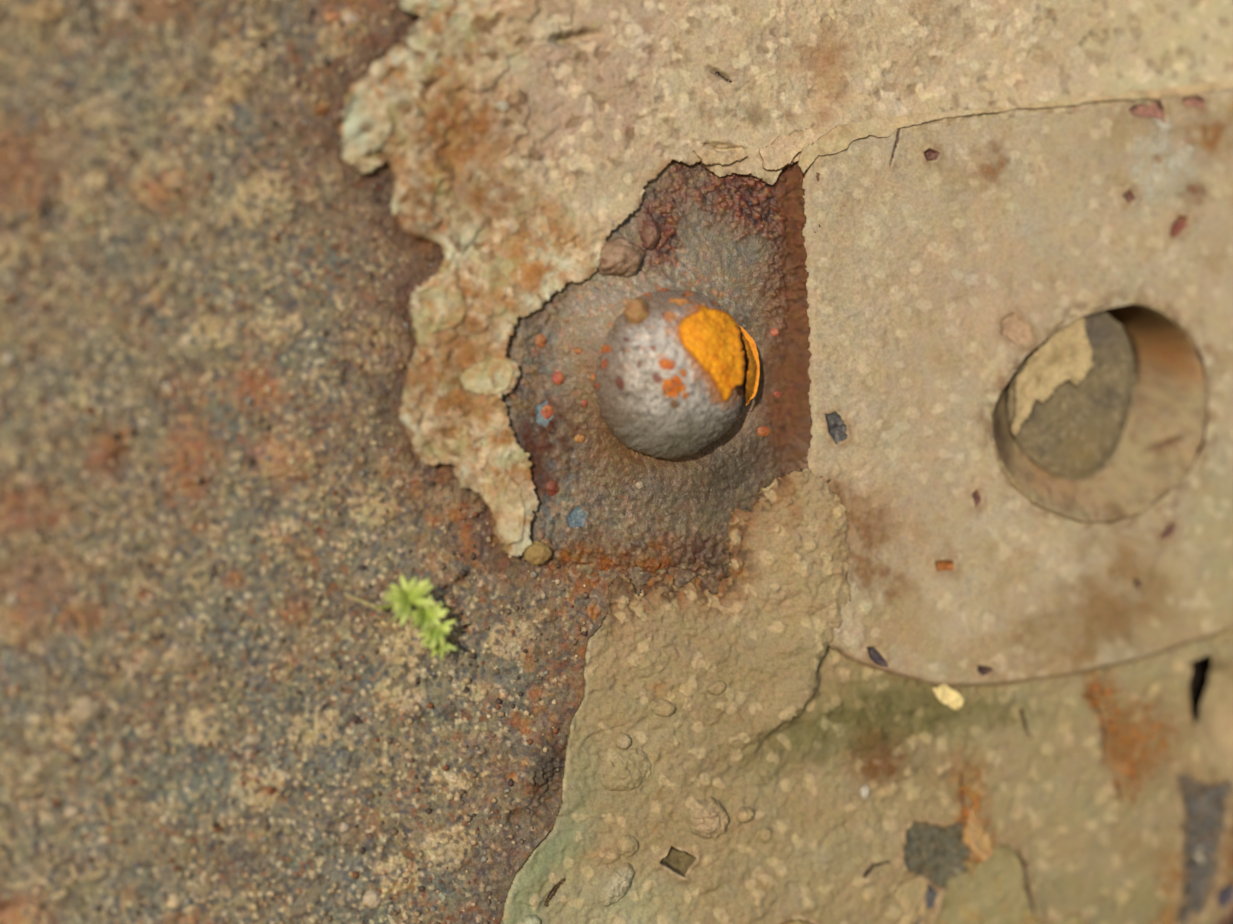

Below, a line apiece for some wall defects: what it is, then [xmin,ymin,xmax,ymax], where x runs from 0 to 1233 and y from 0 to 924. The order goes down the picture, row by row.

crack [889,128,900,166]
corrosion [598,220,661,278]
corrosion [644,288,694,322]
corrosion [757,165,810,446]
corrosion [411,362,468,416]
corrosion [581,338,629,408]
corrosion [651,346,689,409]
corrosion [735,332,749,396]
corrosion [523,400,585,455]
corrosion [529,468,559,496]
peeling [338,0,1233,924]